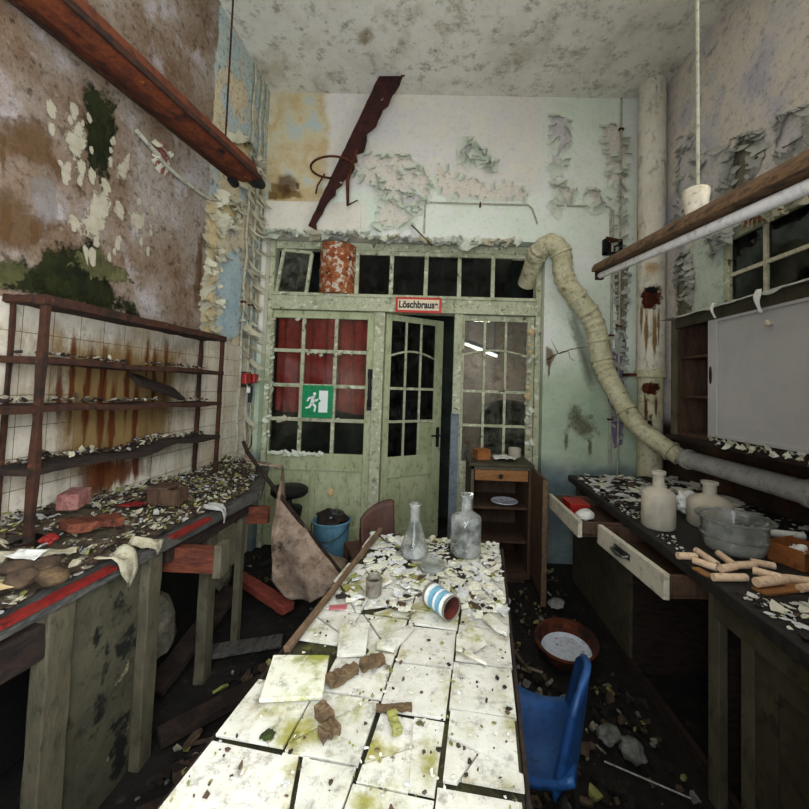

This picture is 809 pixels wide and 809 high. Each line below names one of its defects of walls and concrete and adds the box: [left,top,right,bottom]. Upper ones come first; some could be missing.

damp [0,116,62,247]
damp [89,117,115,172]
peeling [58,102,153,267]
damp [269,176,301,199]
peeling [546,113,633,251]
peeling [669,103,809,222]
damp [0,241,117,306]
peeling [198,128,530,458]
corrosion [640,286,663,353]
corrosion [48,331,183,453]
corrosion [641,382,660,427]
corrosion [81,458,143,497]